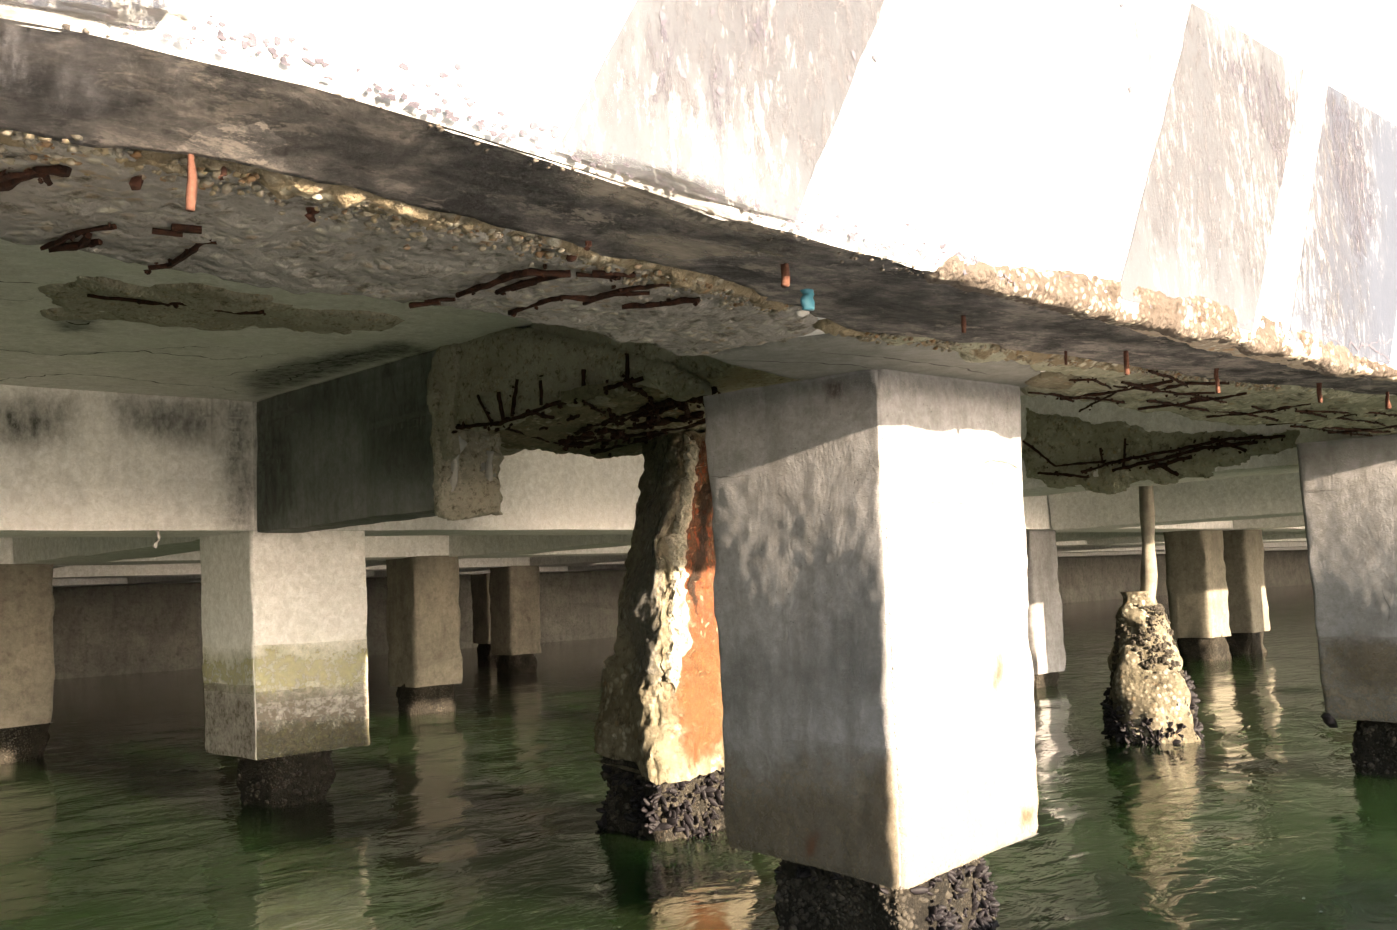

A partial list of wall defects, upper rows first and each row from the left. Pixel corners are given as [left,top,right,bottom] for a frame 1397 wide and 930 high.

water stain [5,401,60,439]
spalling [0,129,1397,695]
water stain [203,686,369,760]
rust [673,435,723,768]